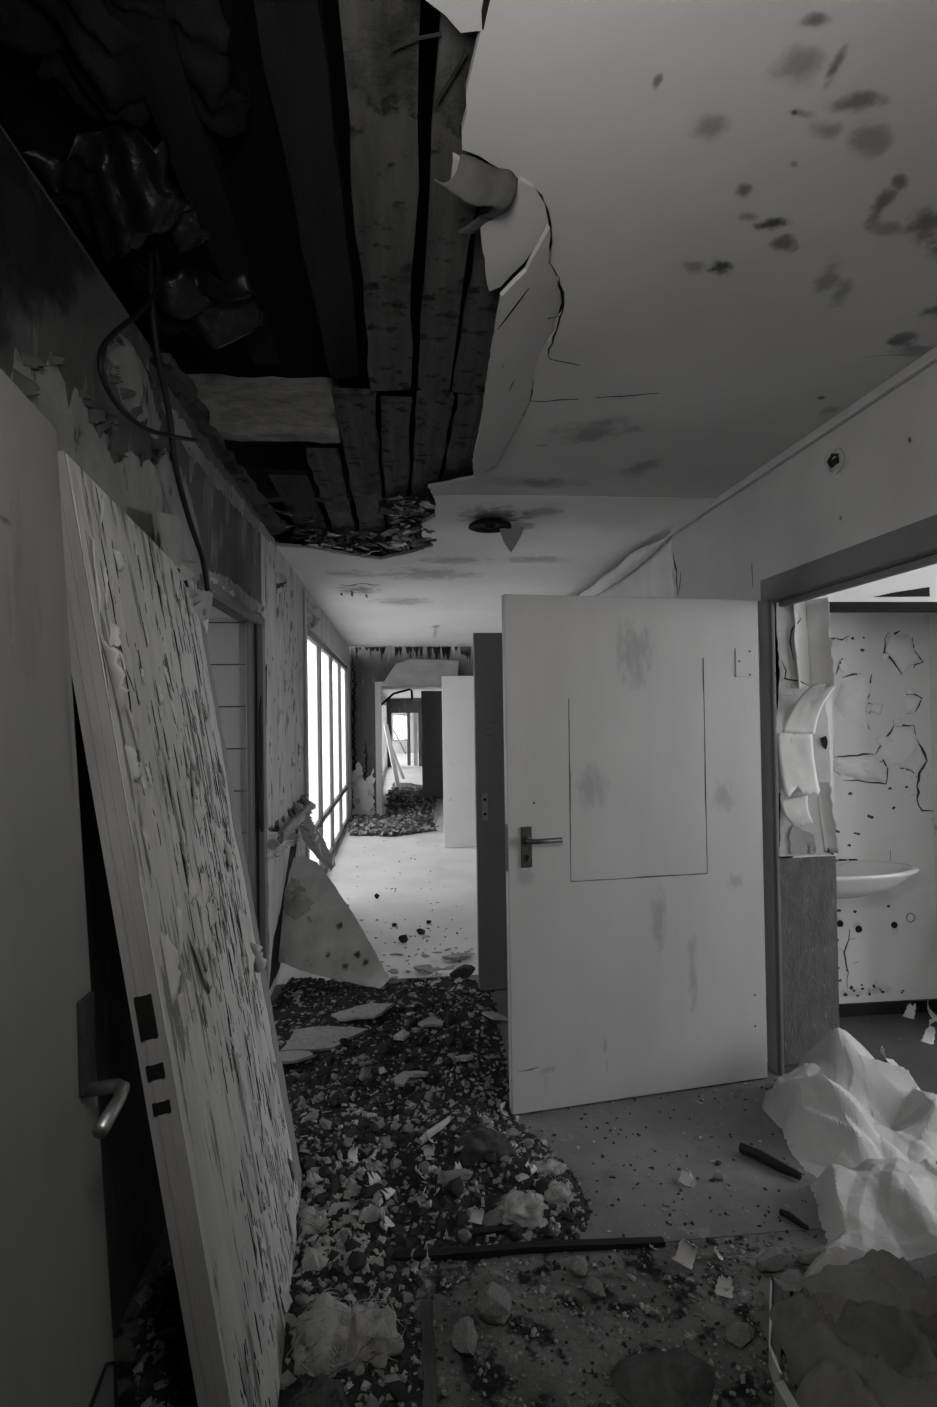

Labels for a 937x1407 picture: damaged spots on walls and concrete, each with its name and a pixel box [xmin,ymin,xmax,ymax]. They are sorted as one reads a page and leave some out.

leakage [756,218,784,228]
peeling [11,333,324,1407]